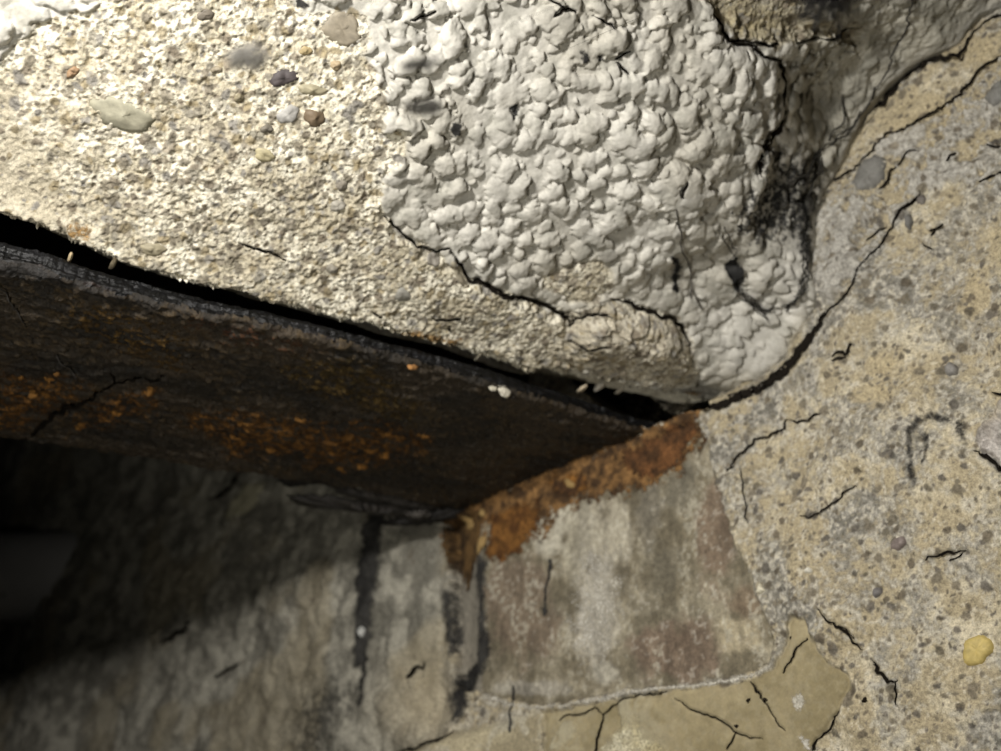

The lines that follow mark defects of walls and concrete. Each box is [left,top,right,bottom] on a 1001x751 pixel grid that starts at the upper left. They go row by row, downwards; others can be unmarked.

crack [709,2,864,177]
crack [833,14,1001,190]
spalling [0,0,706,403]
crack [385,217,691,352]
crack [702,191,920,411]
rust [0,372,164,440]
rust [180,408,437,476]
peeling [351,503,464,527]
rust [439,410,708,591]
leakage [440,590,464,657]
leakage [449,555,490,722]
crack [818,609,897,705]